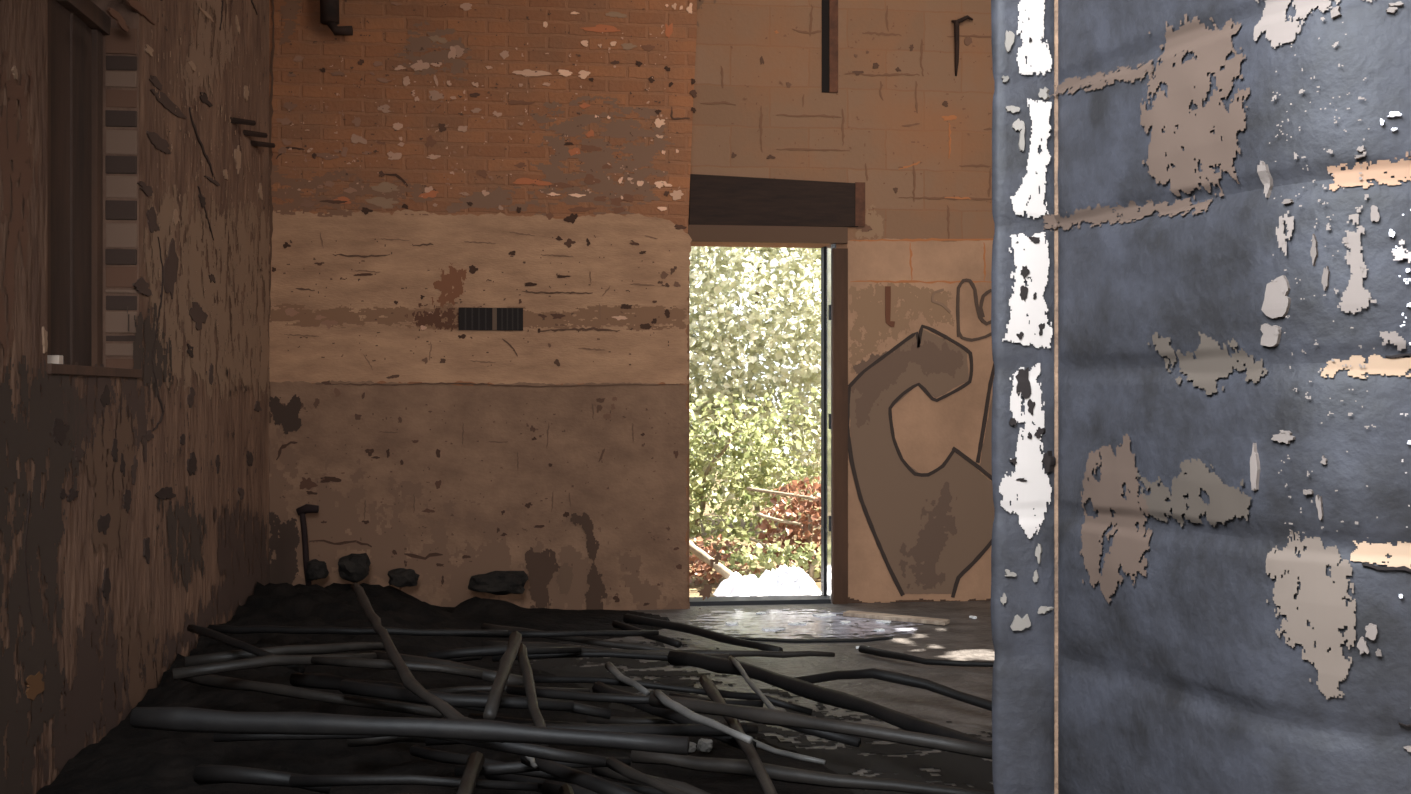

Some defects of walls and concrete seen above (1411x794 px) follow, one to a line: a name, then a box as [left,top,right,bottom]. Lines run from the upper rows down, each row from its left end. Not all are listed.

peeling [1253,0,1340,49]
peeling [1257,161,1294,256]
peeling [1310,194,1380,314]
peeling [1391,239,1411,263]
peeling [999,0,1056,582]
peeling [1260,275,1291,347]
peeling [1379,331,1406,351]
peeling [1250,431,1296,491]
damp [269,426,723,610]
peeling [1303,489,1323,520]
peeling [1000,593,1054,631]
peeling [1266,530,1382,700]